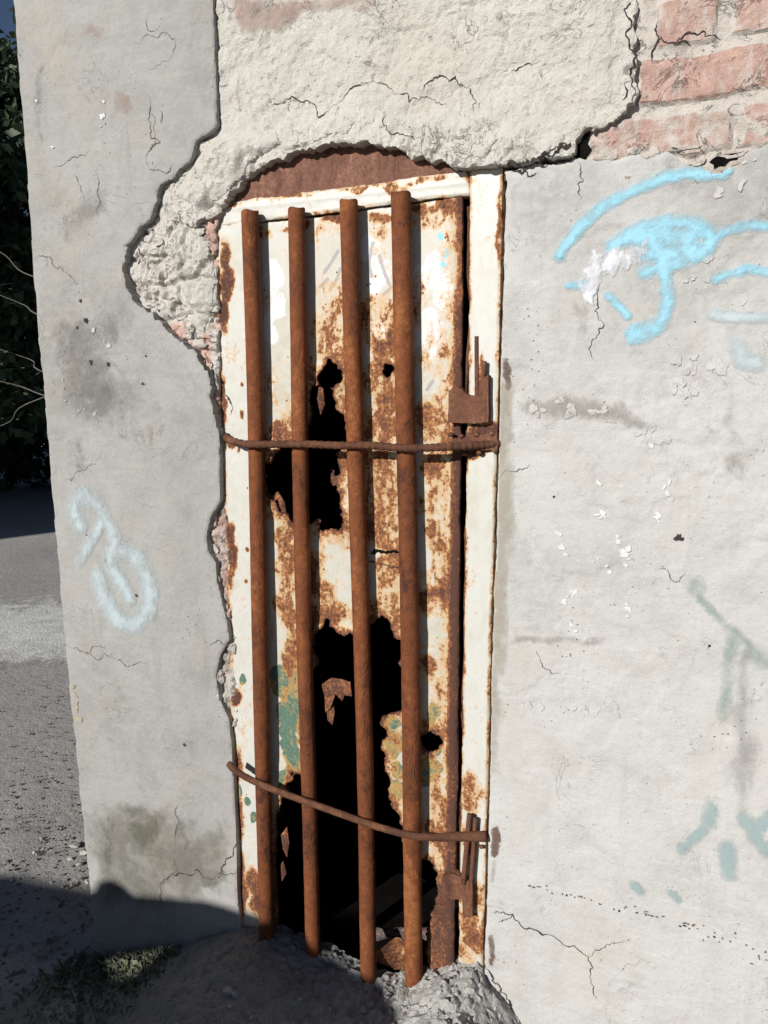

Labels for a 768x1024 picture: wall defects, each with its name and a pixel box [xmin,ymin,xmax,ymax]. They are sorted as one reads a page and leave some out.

crack [145,96,172,174]
crack [269,75,476,118]
crack [507,142,583,196]
spalling [573,0,768,199]
spalling [127,170,225,418]
spalling [210,502,232,621]
spalling [217,637,238,727]
crack [159,843,238,901]
leakage [202,882,237,910]
corrosion [491,827,500,857]
crack [485,966,512,1010]
crack [497,911,626,995]